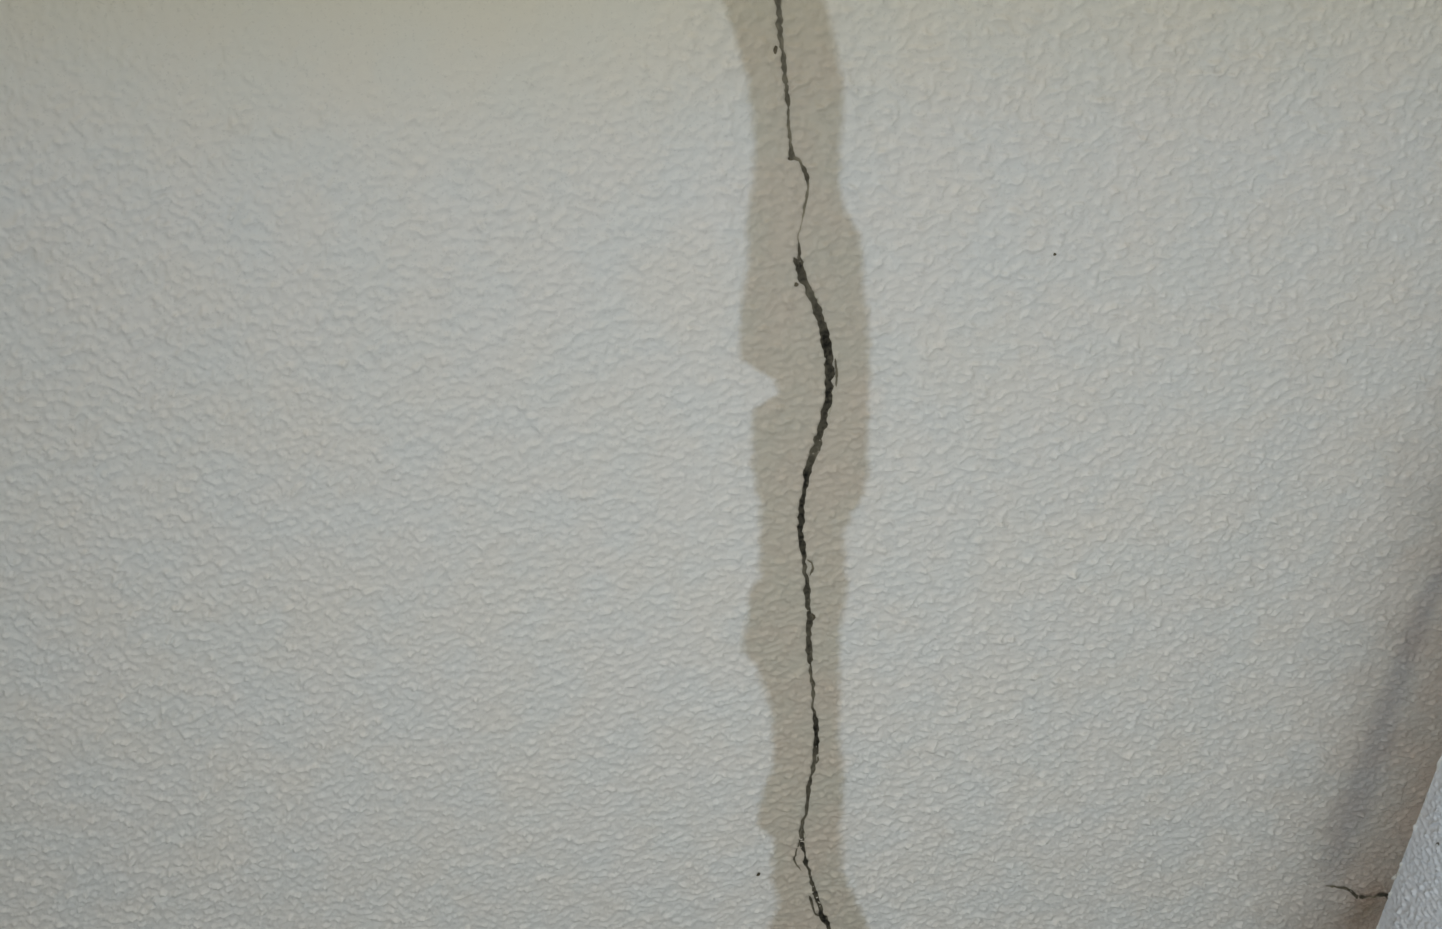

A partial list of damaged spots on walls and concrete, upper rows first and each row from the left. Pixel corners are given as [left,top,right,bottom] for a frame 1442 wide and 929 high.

crack [773,0,838,929]